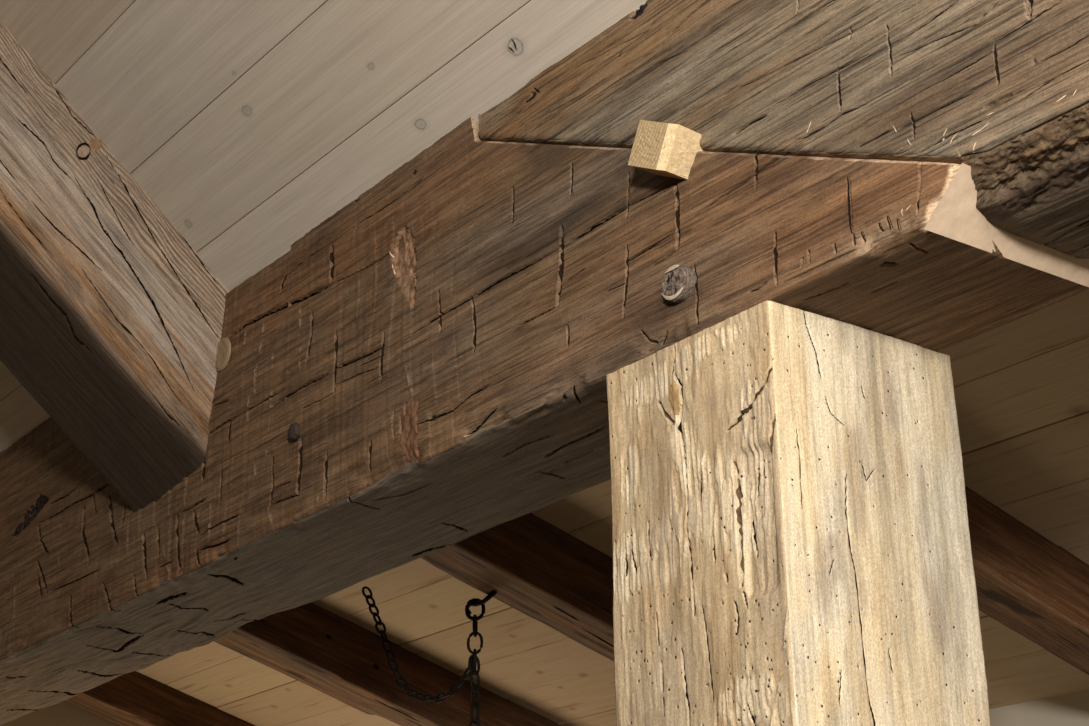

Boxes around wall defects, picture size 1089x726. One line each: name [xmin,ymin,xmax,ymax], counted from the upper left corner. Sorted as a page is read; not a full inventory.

crack [1019,35,1089,101]
crack [695,104,866,216]
crack [0,58,389,433]
crack [413,184,679,333]
crack [751,250,855,292]
crack [803,309,845,426]
crack [642,331,748,726]